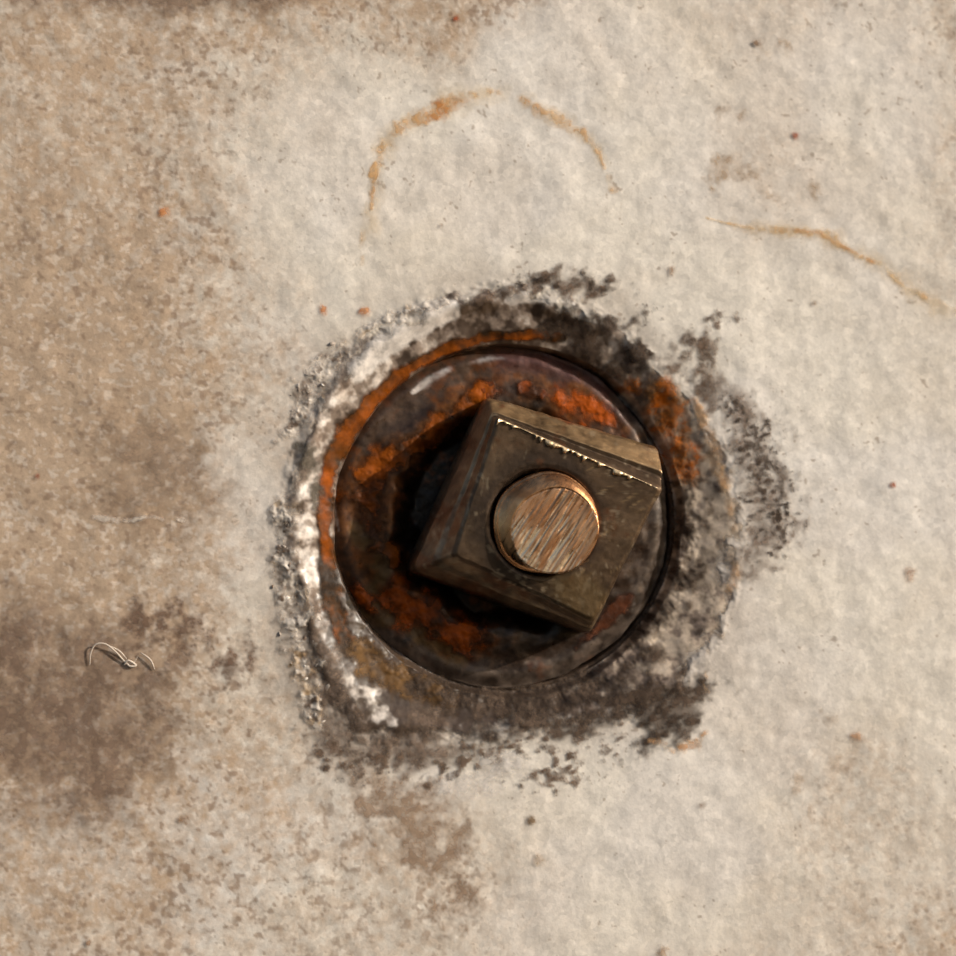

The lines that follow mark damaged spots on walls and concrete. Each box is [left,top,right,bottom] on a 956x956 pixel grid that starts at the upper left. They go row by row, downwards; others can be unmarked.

corrosion [395,99,449,133]
corrosion [369,162,378,209]
damp [476,265,616,305]
damp [537,304,649,379]
damp [294,441,324,509]
corrosion [620,377,707,482]
damp [666,312,807,576]
corrosion [317,328,625,711]
damp [311,480,716,796]